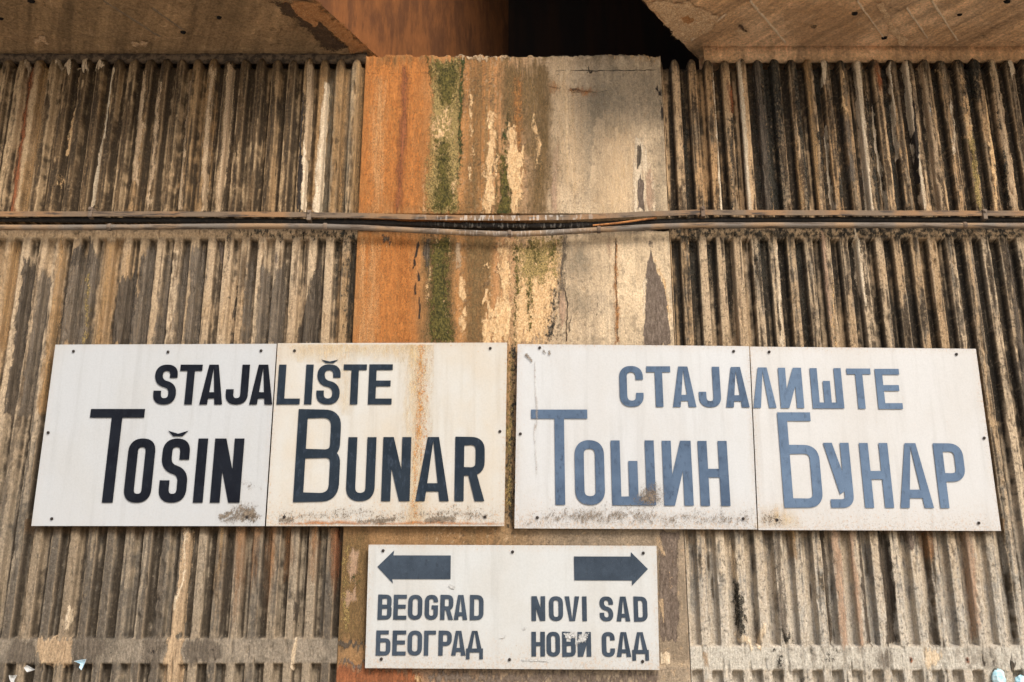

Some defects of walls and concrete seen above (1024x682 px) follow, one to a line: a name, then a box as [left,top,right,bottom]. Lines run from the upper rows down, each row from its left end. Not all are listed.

water stain [91,67,115,207]
water stain [215,62,236,212]
water stain [312,71,336,212]
corrosion [268,0,426,213]
peeling [466,94,526,214]
water stain [712,59,927,218]
water stain [4,257,52,421]
water stain [59,236,100,345]
water stain [112,244,206,344]
water stain [228,252,287,347]
water stain [297,230,357,343]
water stain [753,235,786,347]